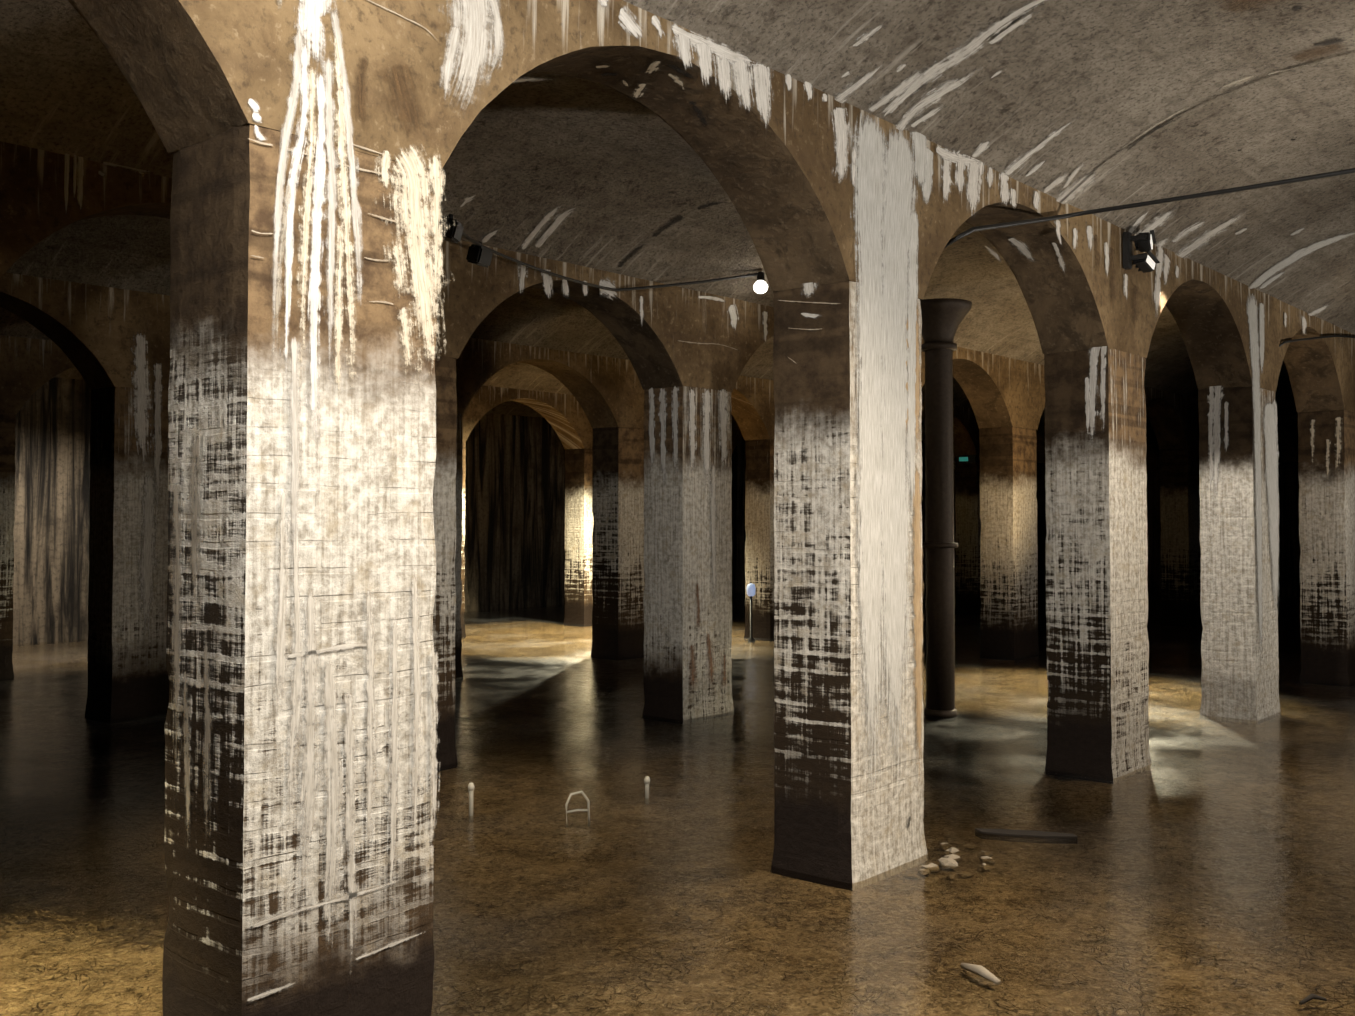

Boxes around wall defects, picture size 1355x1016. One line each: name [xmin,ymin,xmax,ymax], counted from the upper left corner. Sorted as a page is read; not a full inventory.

damp [1033,164,1095,210]
damp [518,206,617,299]
damp [1052,212,1247,324]
damp [253,0,440,960]
damp [598,0,1073,782]
damp [1085,346,1107,435]
damp [1207,386,1229,492]
damp [131,333,212,824]
damp [247,983,292,1001]